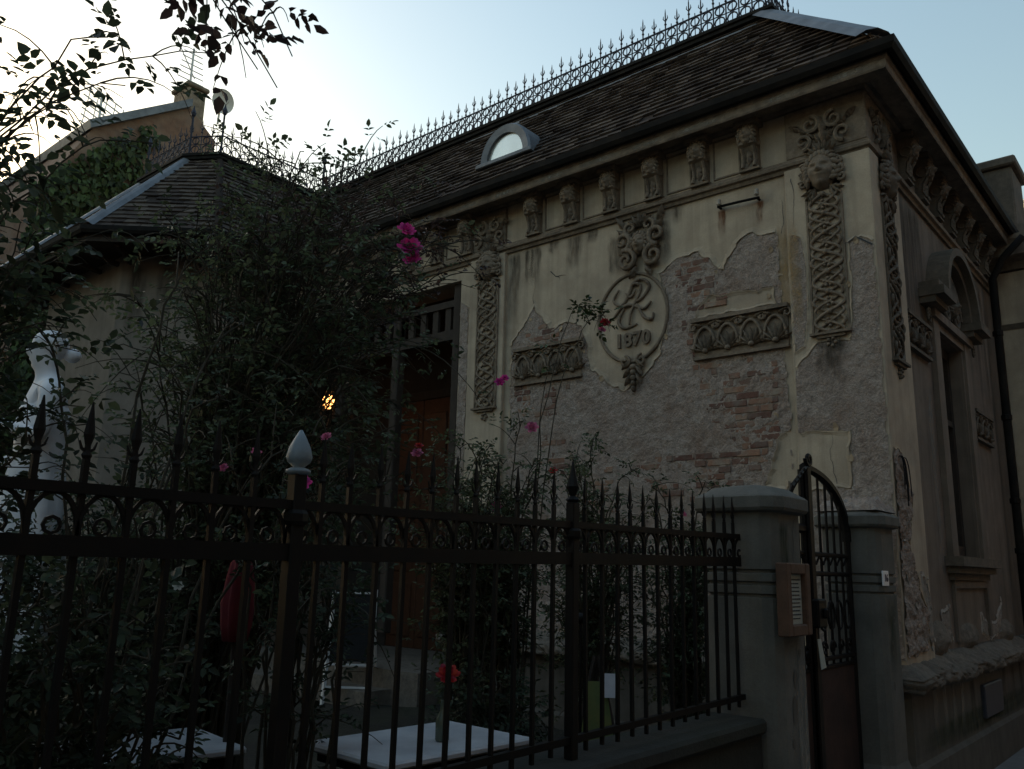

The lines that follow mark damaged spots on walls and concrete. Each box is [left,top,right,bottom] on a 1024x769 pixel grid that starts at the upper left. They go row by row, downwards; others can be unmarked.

flaking render [504,227,896,643]